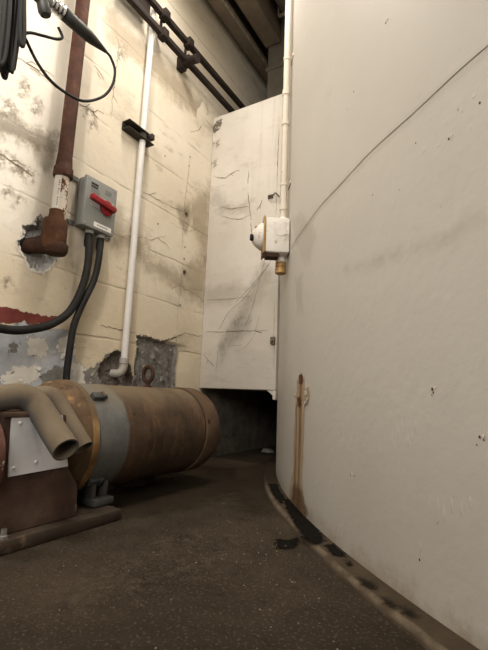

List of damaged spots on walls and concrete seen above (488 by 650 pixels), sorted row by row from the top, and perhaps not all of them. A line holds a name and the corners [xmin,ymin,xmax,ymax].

leakage [0,102,55,152]
crack [0,154,32,176]
flaking render [16,214,59,275]
peeling [0,306,57,326]
peeling [0,329,181,388]
rust [289,373,308,517]